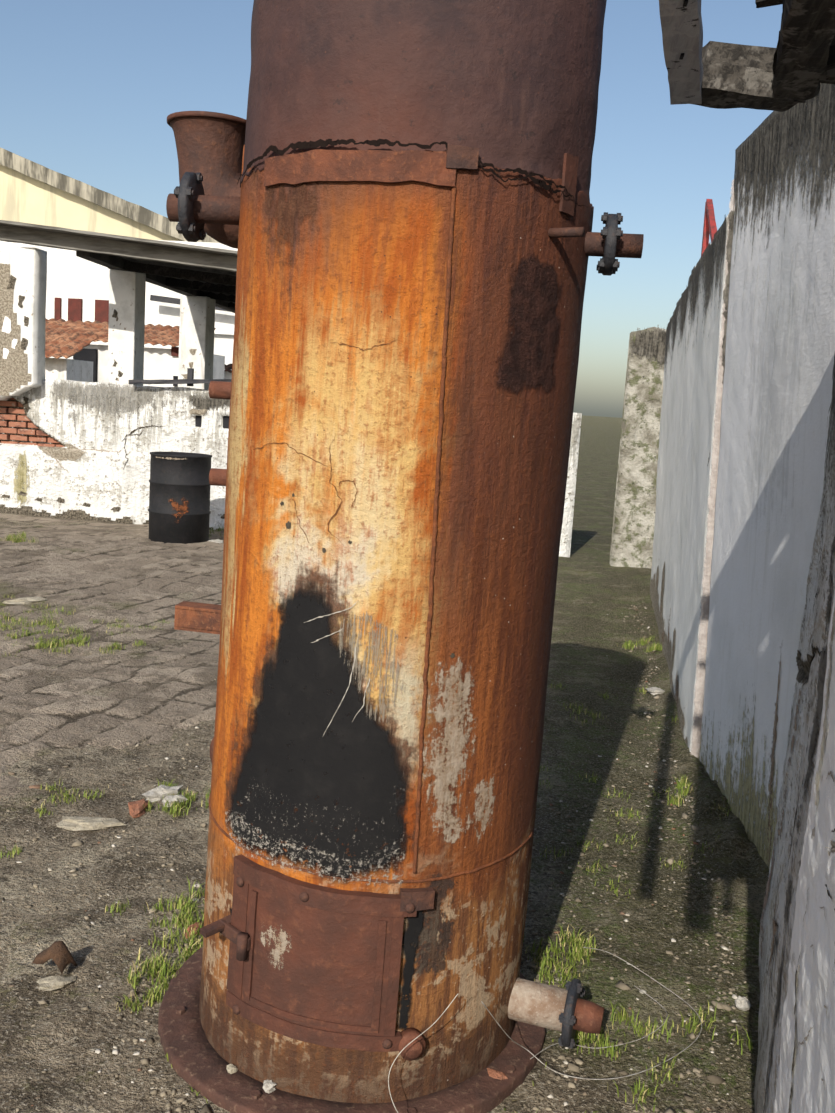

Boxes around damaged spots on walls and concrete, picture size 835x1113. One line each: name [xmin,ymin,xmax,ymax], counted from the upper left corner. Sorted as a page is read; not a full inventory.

peeling [0,263,86,472]
leakage [51,381,230,437]
leakage [631,83,835,758]
leakage [763,537,835,1111]
peeling [820,829,835,920]